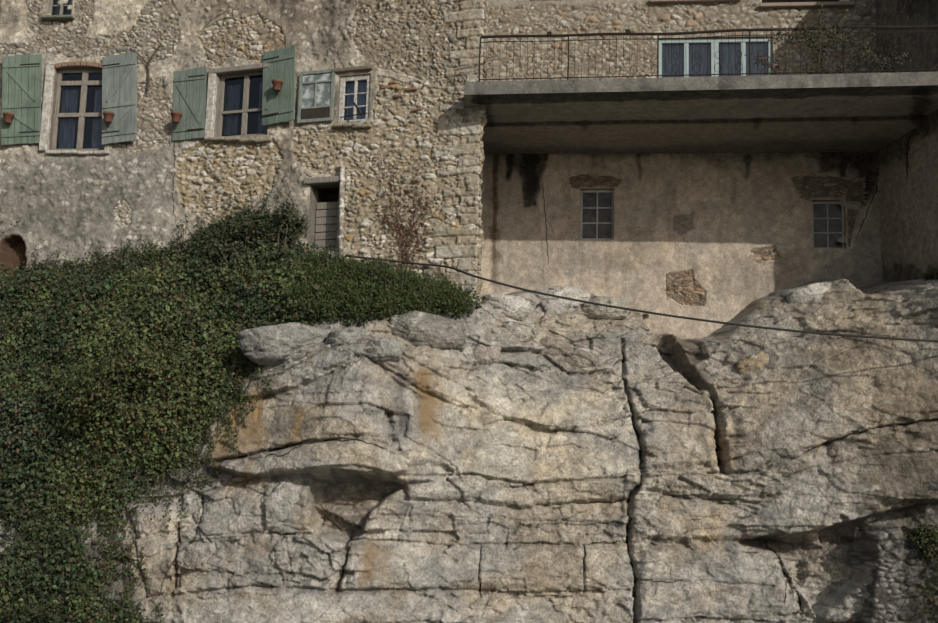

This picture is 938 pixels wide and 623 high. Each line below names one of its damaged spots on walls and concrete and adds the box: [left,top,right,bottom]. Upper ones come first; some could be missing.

flaking render [0,0,286,67]
spalling [112,199,136,230]
flaking render [109,73,173,153]
flaking render [170,0,488,299]
damp [493,154,548,240]
spalling [564,167,624,189]
damp [472,85,938,200]
spalling [791,171,869,247]
spalling [664,268,706,307]
spalling [749,242,786,265]